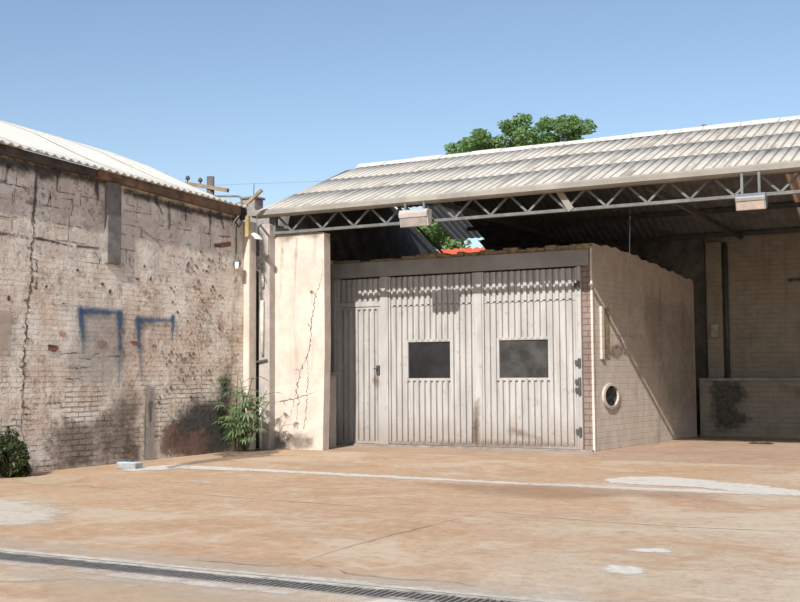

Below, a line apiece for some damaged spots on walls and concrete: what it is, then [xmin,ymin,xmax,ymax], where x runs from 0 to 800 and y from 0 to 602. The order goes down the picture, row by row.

crack [17,166,39,440]
flaking render [44,410,138,462]
flaking render [158,349,234,456]
peeling [170,236,231,341]
damp [171,367,231,456]
crack [279,259,323,444]
damp [711,382,747,432]